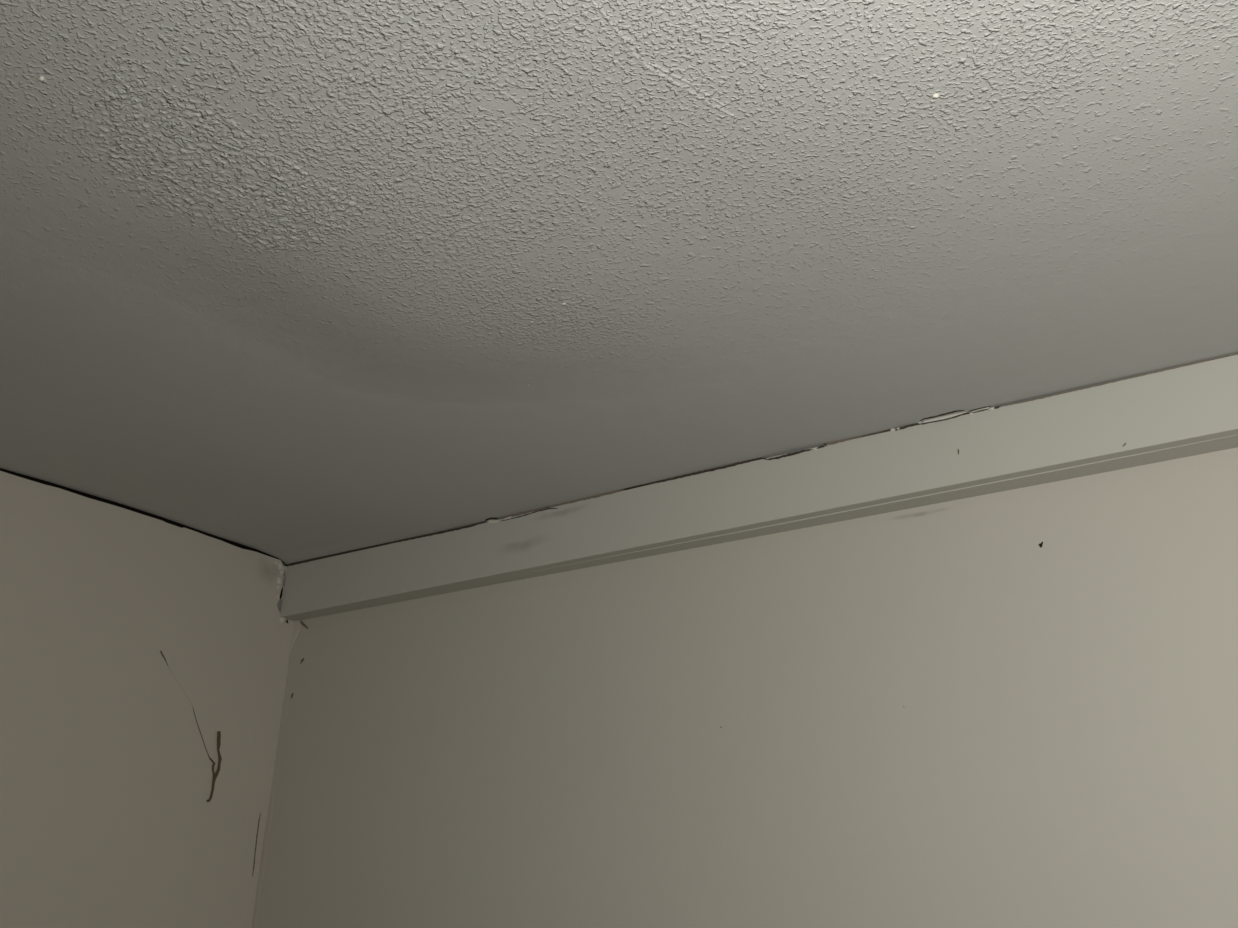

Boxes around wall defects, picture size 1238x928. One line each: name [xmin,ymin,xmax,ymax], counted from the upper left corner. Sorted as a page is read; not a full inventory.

crack [275,353,1238,629]